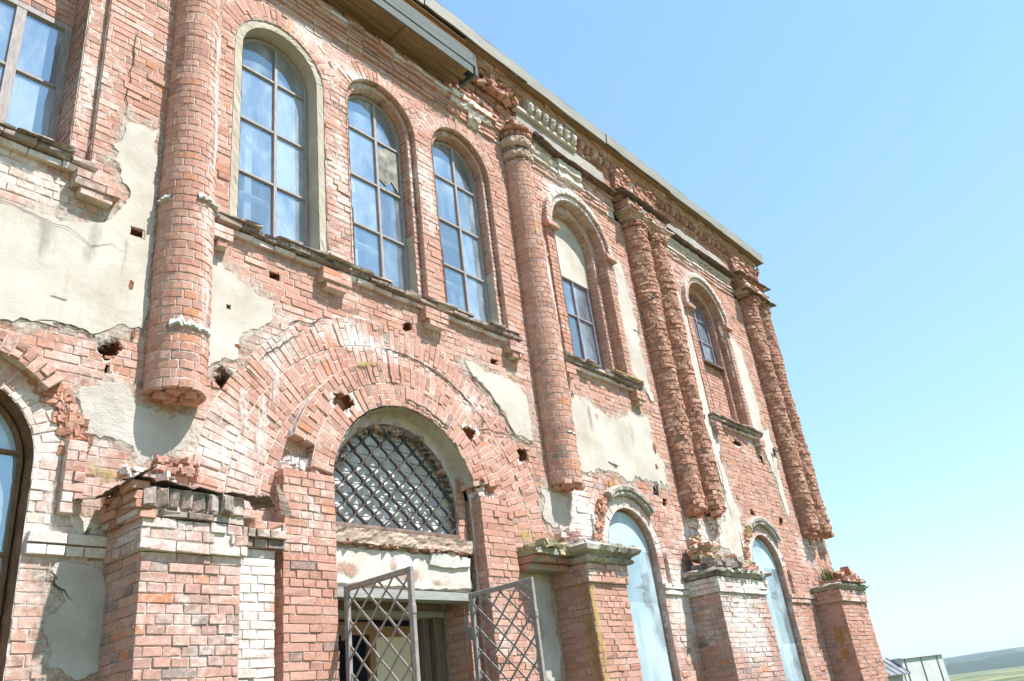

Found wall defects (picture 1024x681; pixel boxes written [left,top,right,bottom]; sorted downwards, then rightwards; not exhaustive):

crack [126,34,137,118]
flaking render [0,108,164,347]
flaking render [208,255,277,376]
crack [237,318,324,379]
flaking render [22,370,200,481]
flaking render [460,355,540,450]
flaking render [570,392,671,491]
flaking render [674,280,753,561]
flaking render [55,499,99,536]
flaking render [538,481,609,543]
flaking render [31,545,106,681]